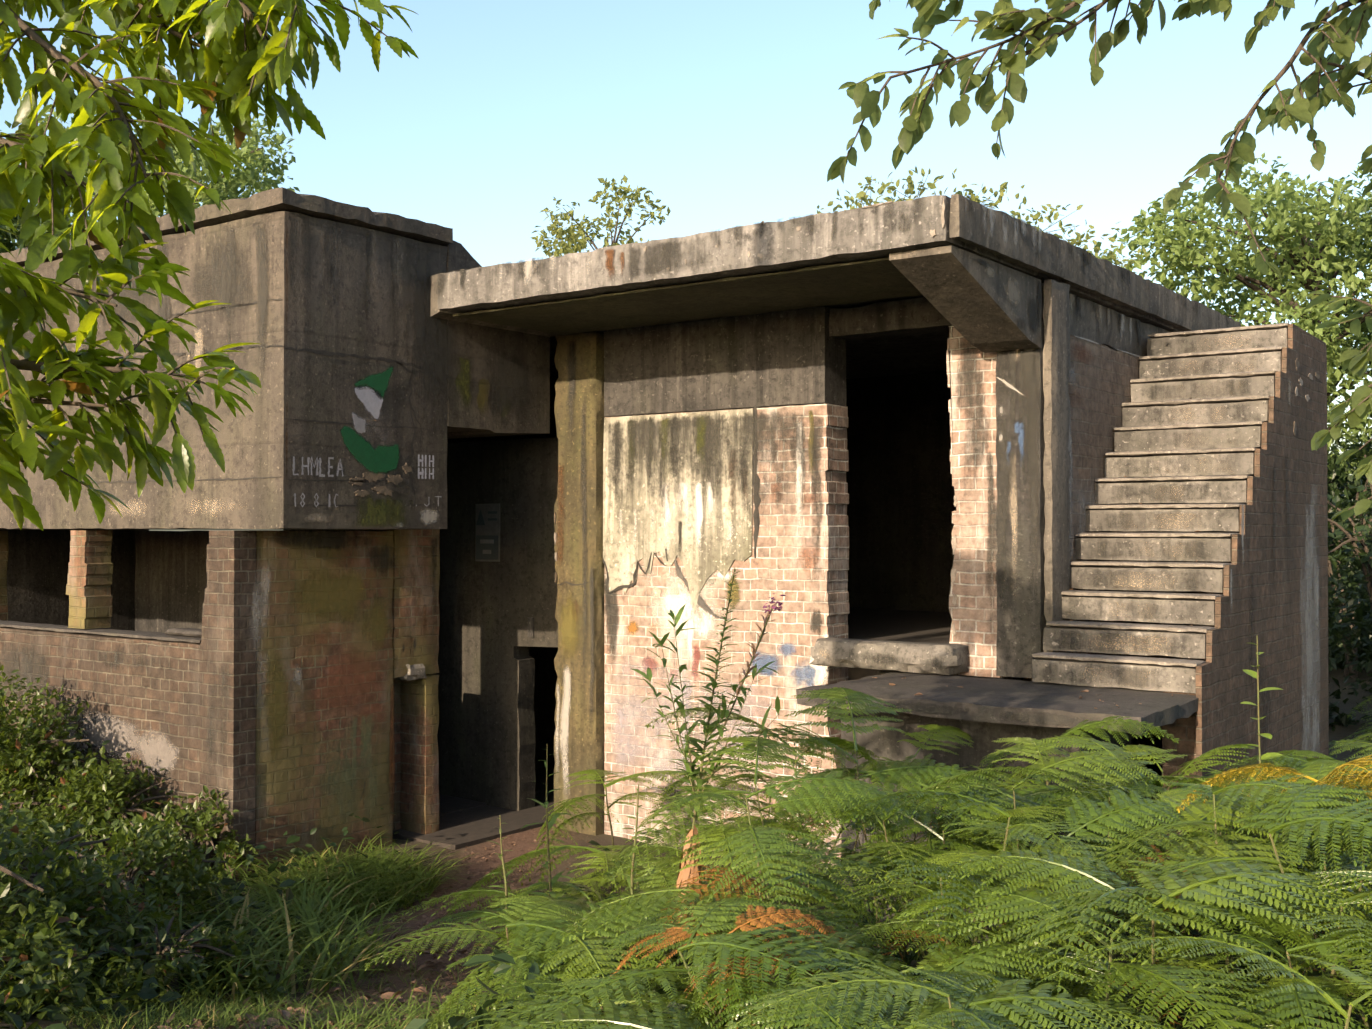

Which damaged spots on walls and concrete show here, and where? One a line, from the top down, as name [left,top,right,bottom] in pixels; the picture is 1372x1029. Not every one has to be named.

damp [629,211,837,276]
damp [609,416,723,551]
damp [253,570,269,633]
crack [555,549,668,594]